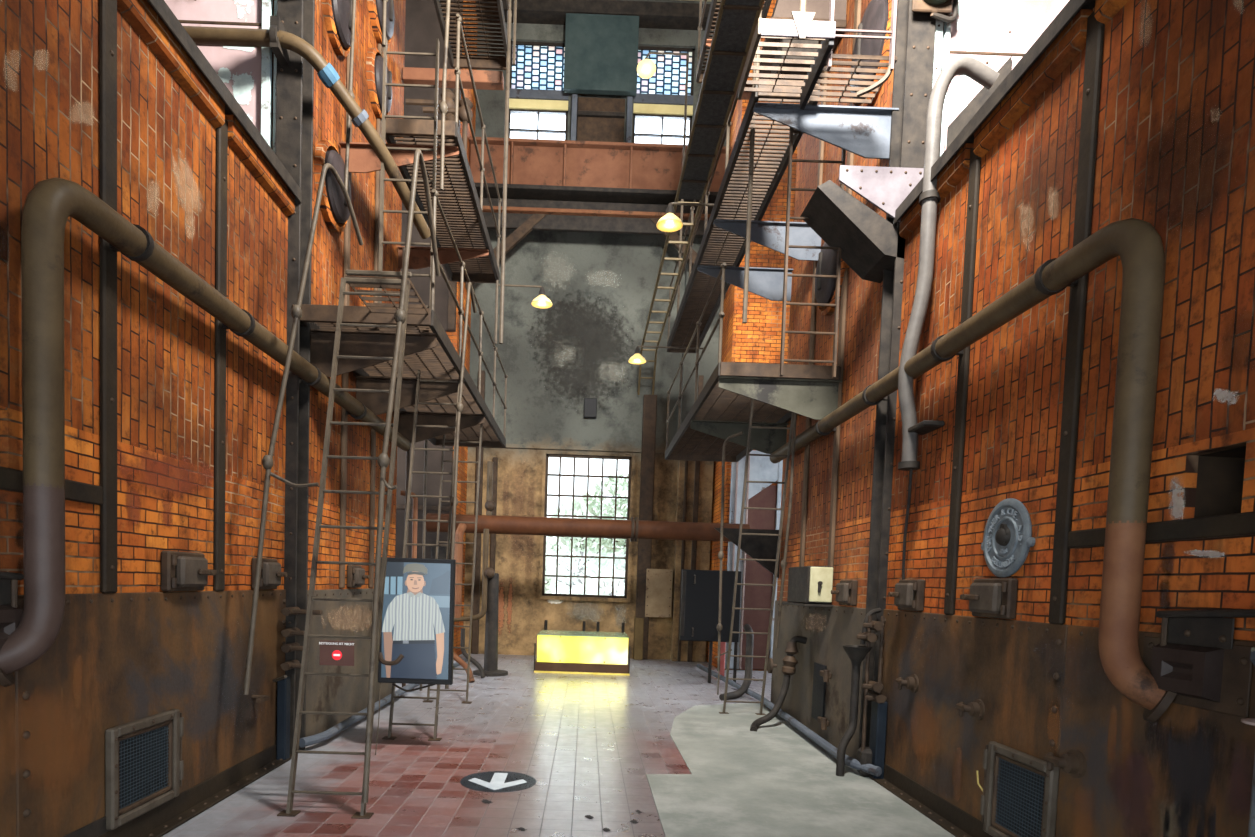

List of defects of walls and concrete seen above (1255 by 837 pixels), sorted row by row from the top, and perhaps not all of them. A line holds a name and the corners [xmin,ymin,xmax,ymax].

peeling [218,68,254,120]